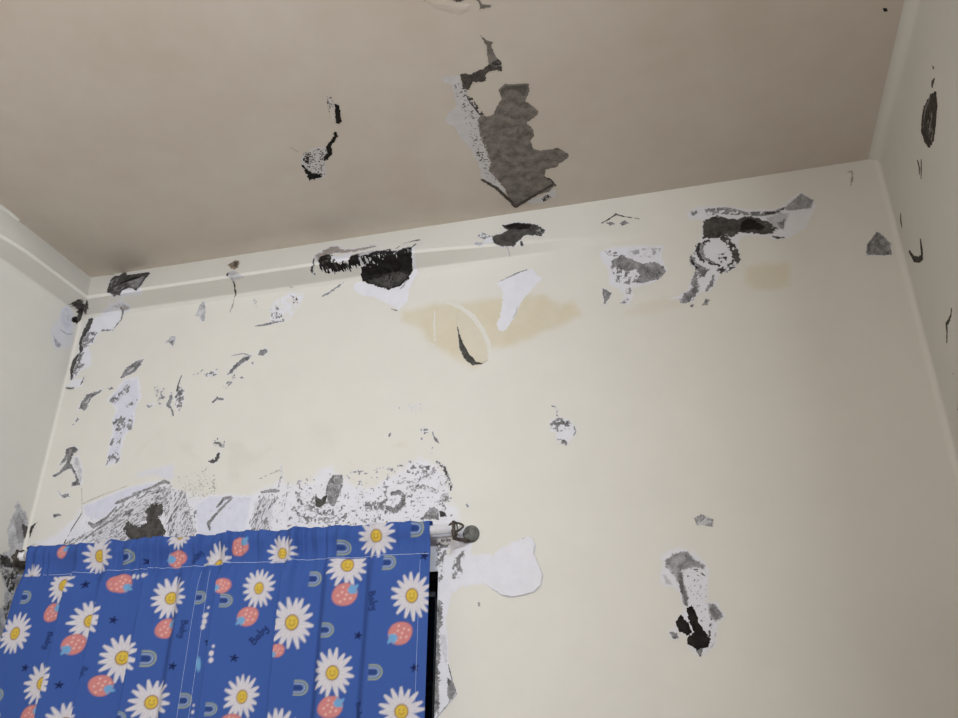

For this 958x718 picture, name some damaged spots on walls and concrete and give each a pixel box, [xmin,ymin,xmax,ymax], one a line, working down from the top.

peeling [290,96,342,181]
peeling [441,35,569,208]
spalling [921,66,938,148]
spalling [226,260,244,313]
spalling [310,239,420,312]
spalling [473,221,547,257]
peeling [599,244,669,306]
peeling [668,192,816,307]
peeling [48,271,269,468]
leakage [397,291,588,375]
peeling [0,427,544,718]
peeling [658,546,727,659]